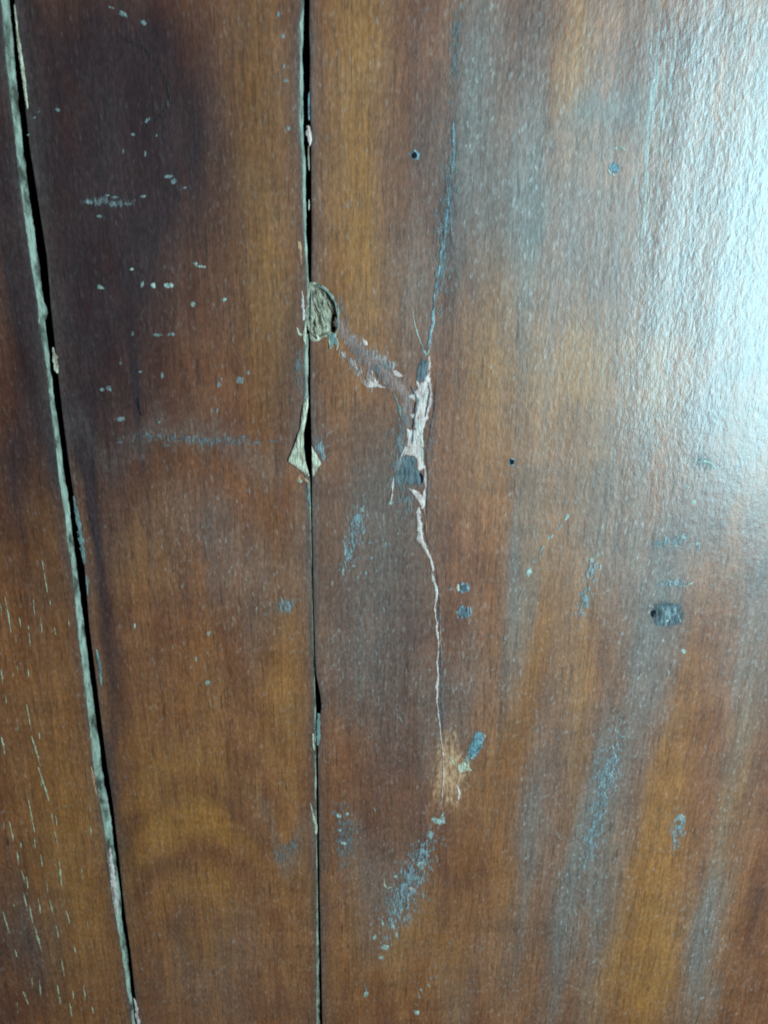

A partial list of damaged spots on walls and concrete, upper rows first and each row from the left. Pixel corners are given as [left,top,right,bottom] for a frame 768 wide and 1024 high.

spalling [296,282,339,341]
crack [388,104,458,804]